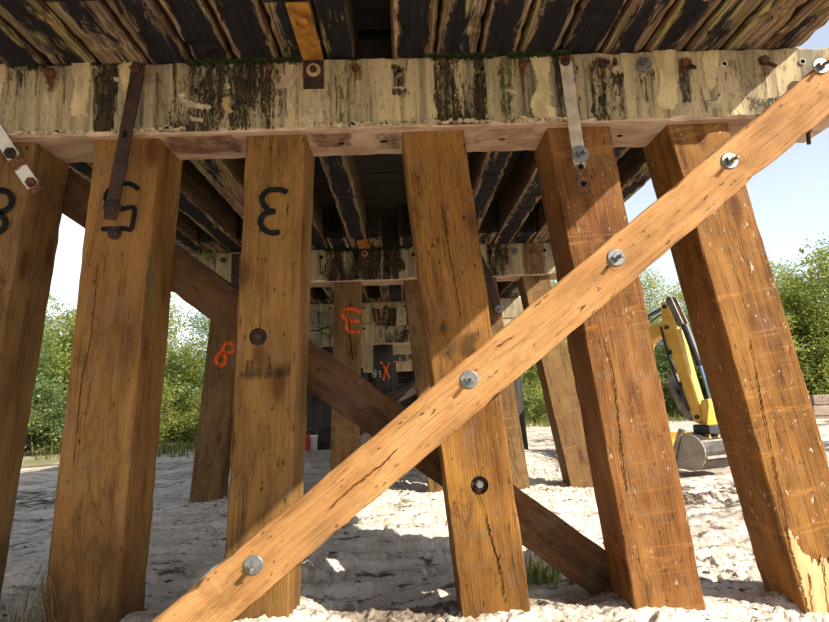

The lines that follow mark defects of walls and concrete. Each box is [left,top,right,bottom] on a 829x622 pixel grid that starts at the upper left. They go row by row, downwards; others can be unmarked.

peeling [70,62,91,118]
peeling [113,61,142,98]
peeling [133,93,212,133]
leakage [157,61,287,132]
leakage [391,60,409,97]
leakage [433,56,489,125]
leakage [496,57,531,123]
peeling [514,54,568,124]
peeling [651,49,678,110]
crack [608,350,628,491]
crack [750,339,788,531]
crack [477,481,505,598]